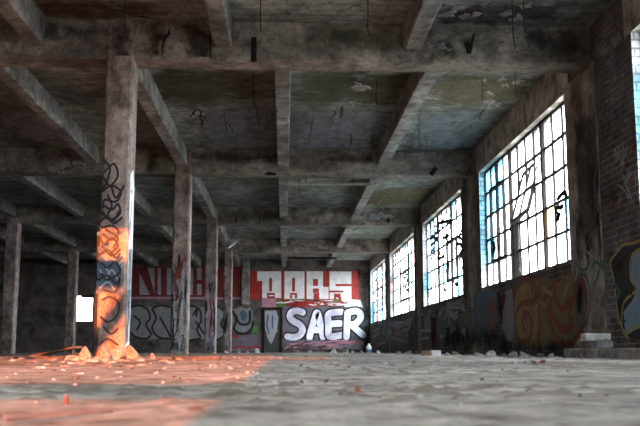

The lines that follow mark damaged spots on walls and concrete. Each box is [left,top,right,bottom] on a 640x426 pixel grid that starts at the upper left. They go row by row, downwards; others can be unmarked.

peeling [436,0,490,20]
peeling [498,2,534,21]
crack [44,4,171,57]
spalling [351,82,371,91]
crack [189,108,208,127]
crack [308,106,359,148]